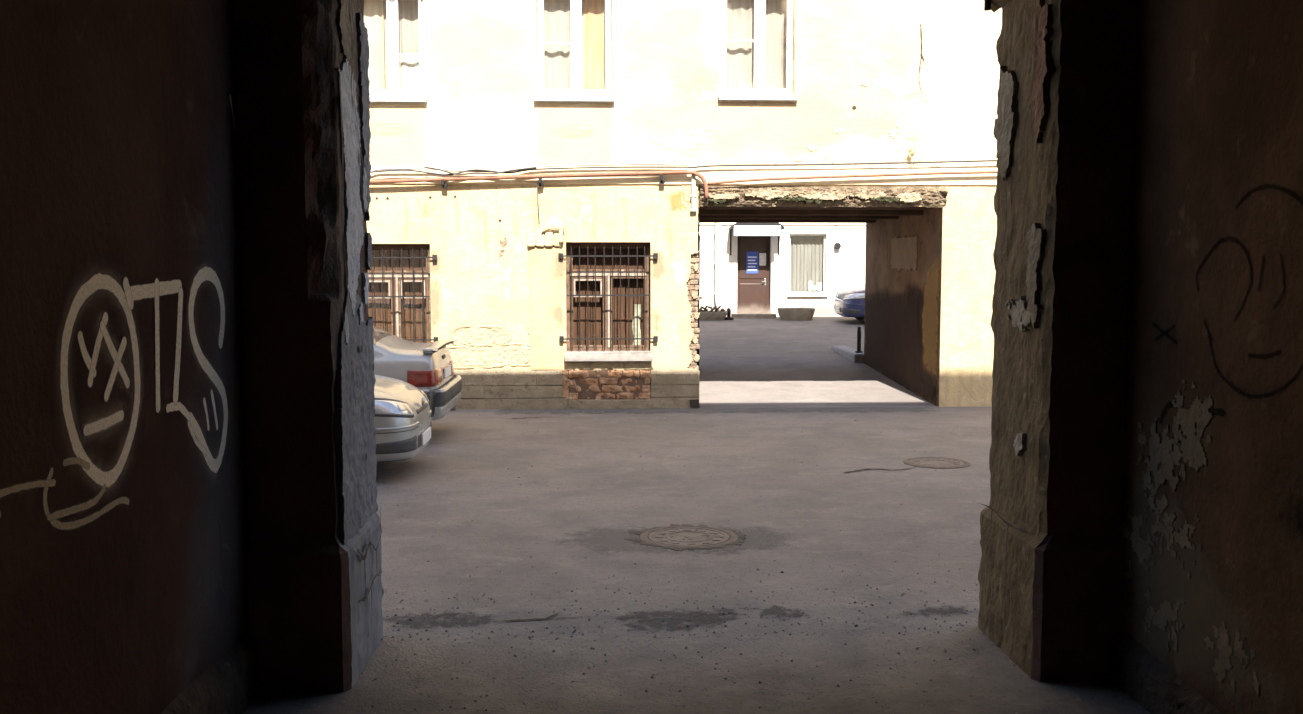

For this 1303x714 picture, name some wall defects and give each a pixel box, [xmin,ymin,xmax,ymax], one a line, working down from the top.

peeling [795,127,914,168]
peeling [993,0,1055,181]
spalling [673,185,923,368]
flaking render [562,362,653,400]
spalling [1122,379,1214,579]